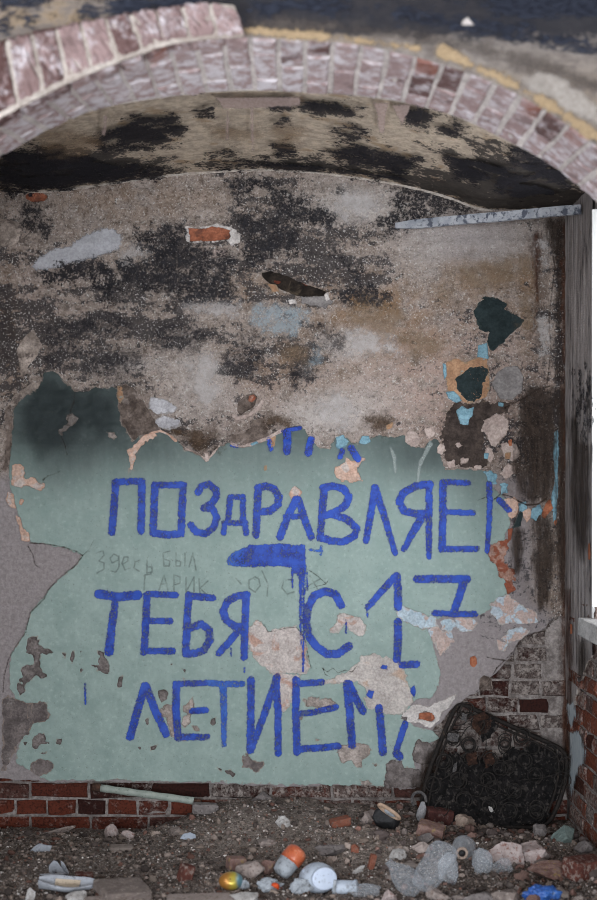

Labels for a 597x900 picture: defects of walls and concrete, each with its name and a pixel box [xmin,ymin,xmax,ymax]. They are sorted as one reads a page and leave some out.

water stain [216,97,300,150]
water stain [374,103,410,133]
water stain [180,300,242,319]
water stain [535,219,565,356]
spalling [117,384,286,470]
water stain [316,394,398,433]
spalling [405,296,559,652]
water stain [512,358,596,609]
spalling [1,637,110,776]
peeling [248,621,310,712]
peeling [324,653,456,728]
peeling [396,606,478,656]